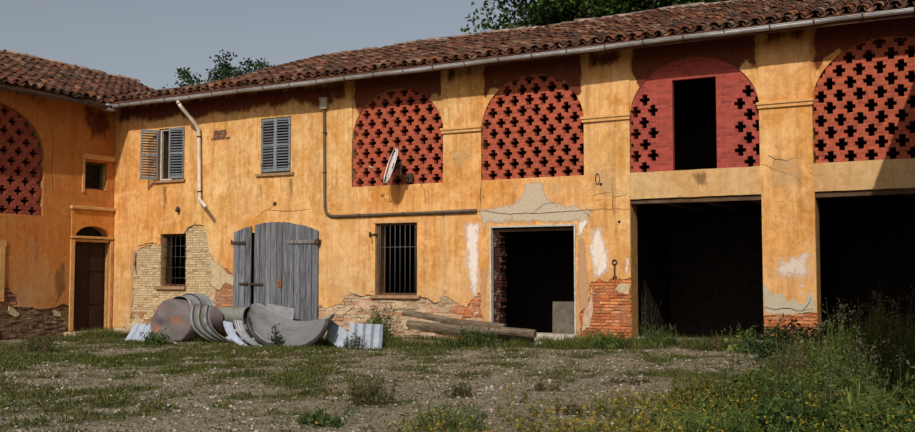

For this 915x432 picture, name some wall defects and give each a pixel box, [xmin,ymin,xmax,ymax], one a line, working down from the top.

flaking render [130,226,233,324]
flaking render [0,288,69,340]
flaking render [318,286,484,340]
flaking render [579,277,632,339]
peeling [763,286,818,341]